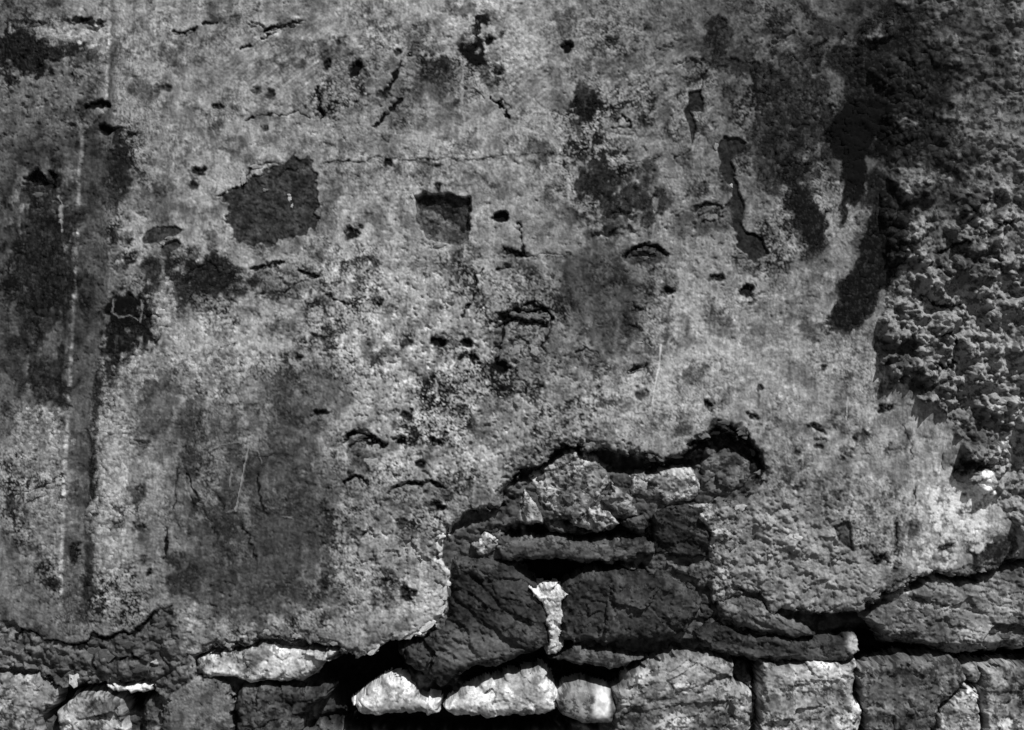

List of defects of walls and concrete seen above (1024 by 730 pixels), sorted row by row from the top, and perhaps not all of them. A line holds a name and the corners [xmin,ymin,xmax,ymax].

peeling [684,63,725,143]
leakage [107,128,135,202]
spalling [410,183,471,247]
peeling [714,136,769,263]
leakage [684,0,990,331]
spalling [851,0,1024,536]
leakage [0,150,263,601]
peeling [398,400,897,641]
spalling [907,557,1010,582]
crack [15,604,173,669]
spalling [0,606,385,701]